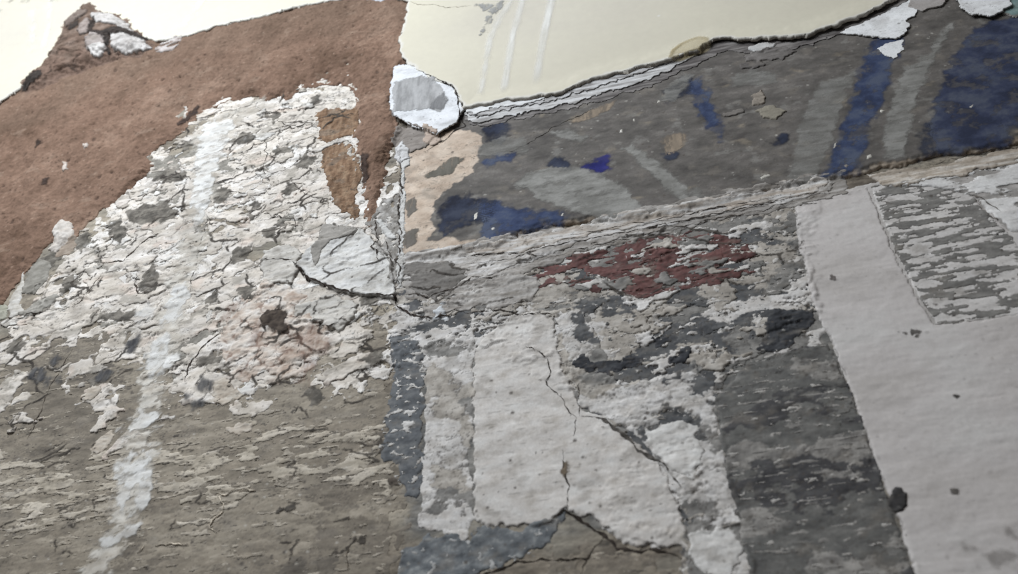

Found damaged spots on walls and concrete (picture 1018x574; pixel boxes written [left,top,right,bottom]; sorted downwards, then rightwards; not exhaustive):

crack [423,72,466,152]
peeling [388,0,1018,325]
crack [0,85,830,469]
peeling [0,369,37,413]
peeling [74,374,125,433]
peeling [90,429,142,461]
crack [342,435,390,484]
crack [484,347,682,574]
crack [54,499,96,556]
crack [332,516,355,568]
peeling [398,511,566,574]
peeling [888,487,908,513]